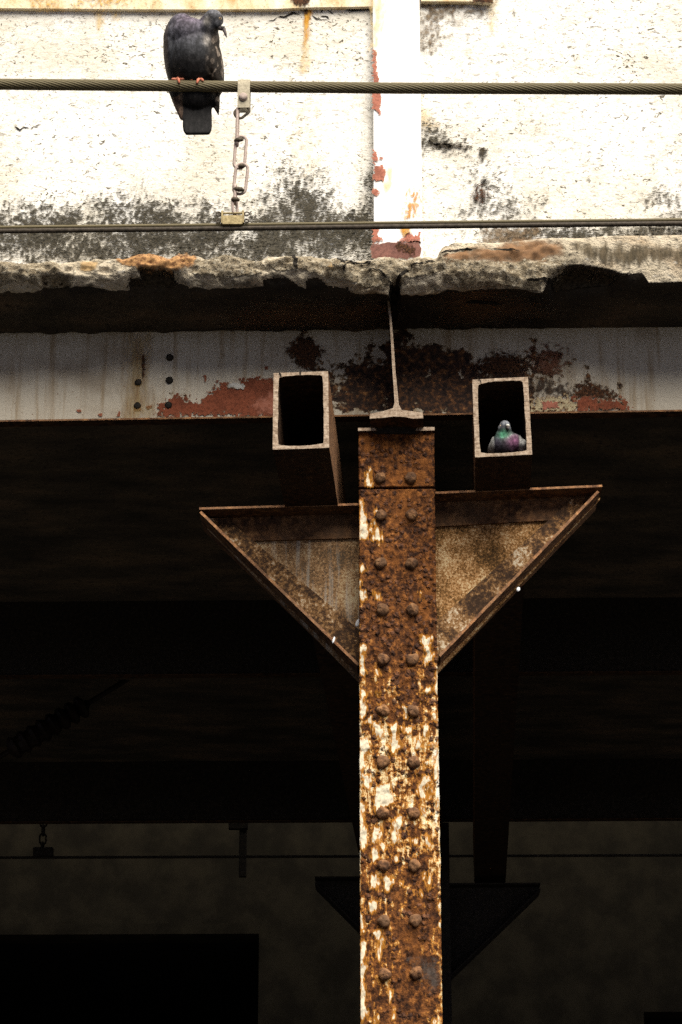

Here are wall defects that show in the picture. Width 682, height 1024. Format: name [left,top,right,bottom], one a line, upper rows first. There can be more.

damp [0,159,374,264]
corrosion [401,186,424,237]
spalling [0,261,72,289]
corrosion [116,253,197,273]
spalling [127,229,634,307]
corrosion [446,240,562,261]
peeling [136,366,274,417]
corrosion [284,337,324,370]
corrosion [471,343,620,402]